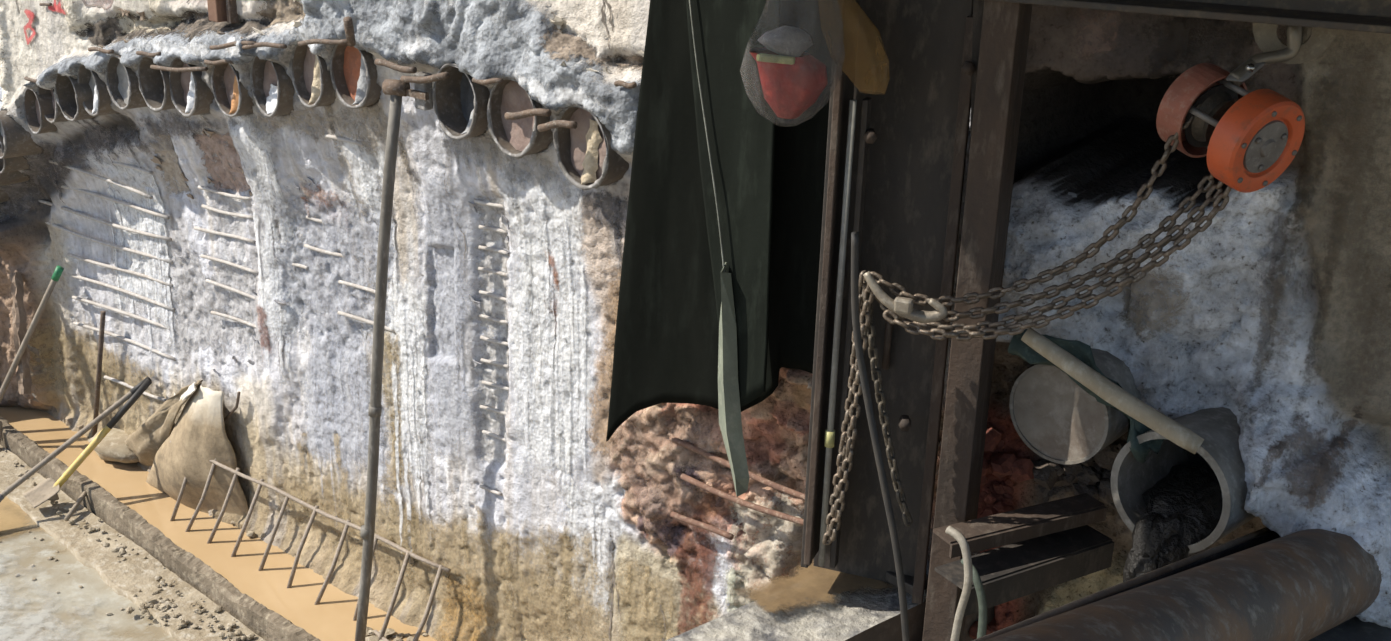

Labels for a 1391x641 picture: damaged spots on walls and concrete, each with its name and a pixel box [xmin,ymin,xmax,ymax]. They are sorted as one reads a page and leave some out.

crack [601,0,613,49]
spalling [680,471,805,525]
spalling [670,511,734,540]
rust [676,492,724,635]